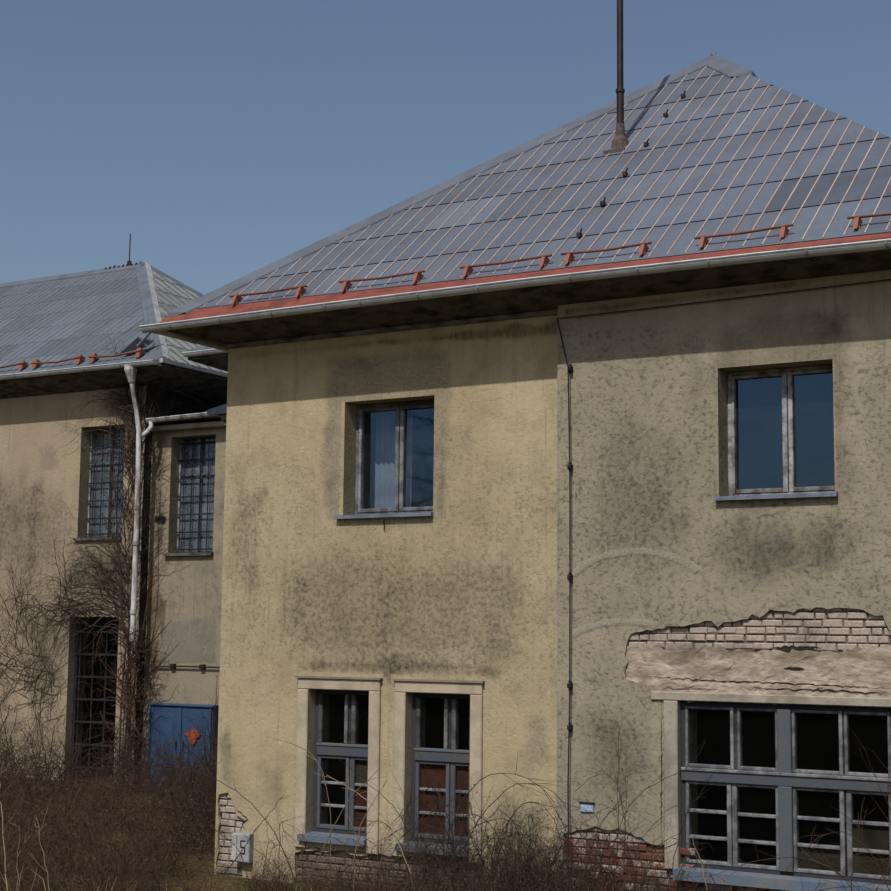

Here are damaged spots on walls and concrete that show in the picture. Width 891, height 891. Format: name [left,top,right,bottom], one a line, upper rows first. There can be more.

spalling [624,607,891,709]
spalling [216,793,244,877]
spalling [562,826,786,891]